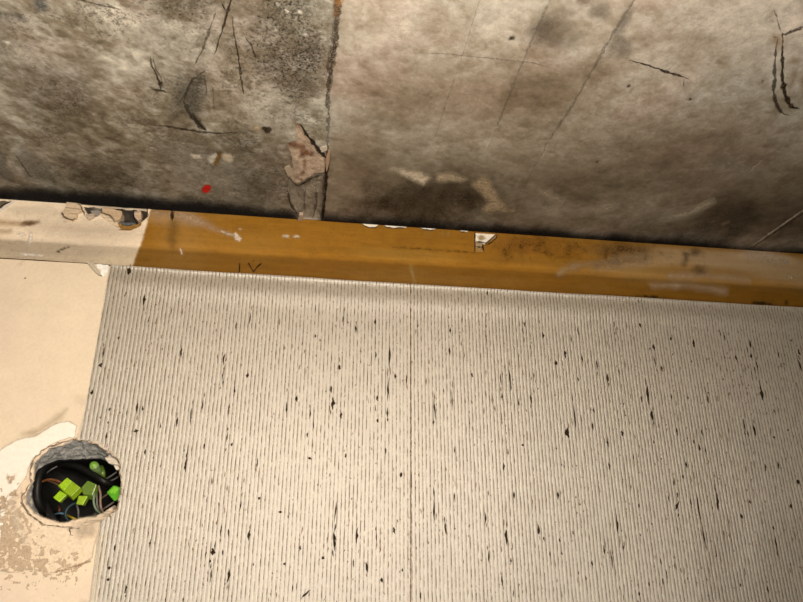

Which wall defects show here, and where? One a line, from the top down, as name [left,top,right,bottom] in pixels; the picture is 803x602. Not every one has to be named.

crack [150,0,256,134]
water stain [248,0,324,110]
crack [322,0,342,209]
crack [772,27,802,115]
spalling [62,202,148,231]
water stain [0,152,296,219]
spalling [284,124,330,221]
water stain [393,168,462,184]
water stain [474,178,506,212]
water stain [321,215,803,264]
spalling [0,421,100,590]